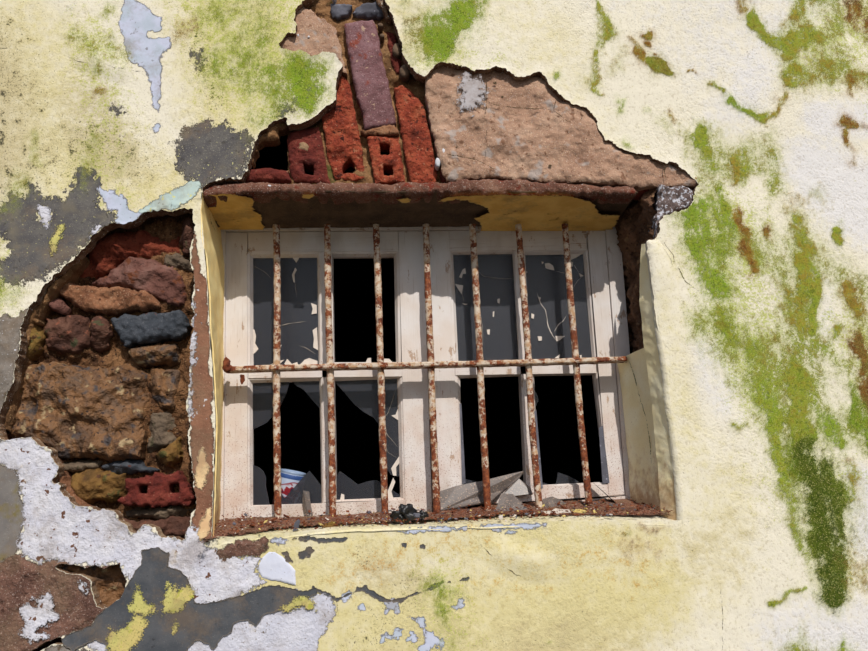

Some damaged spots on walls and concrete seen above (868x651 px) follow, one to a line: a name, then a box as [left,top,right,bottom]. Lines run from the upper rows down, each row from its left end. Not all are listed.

water stain [707,81,769,124]
flaking render [0,0,697,290]
water stain [777,211,823,336]
flaking render [0,213,337,651]
peeling [292,534,348,559]
peeling [398,508,587,548]
peeling [379,598,445,651]